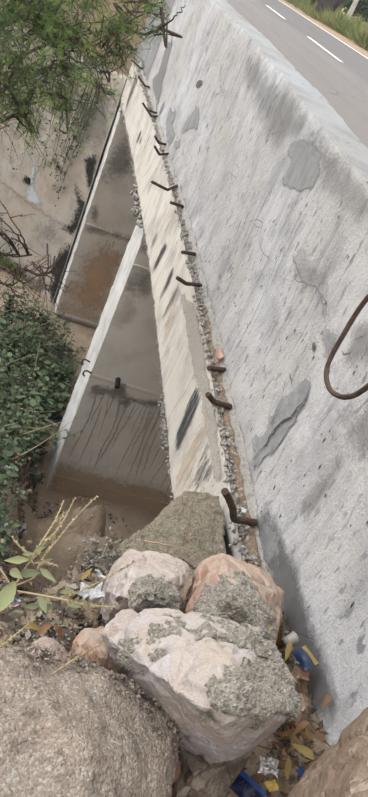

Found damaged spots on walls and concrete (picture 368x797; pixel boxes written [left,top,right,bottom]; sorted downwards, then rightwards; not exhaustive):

water stain [84,126,152,187]
peeling [282,140,321,215]
water stain [43,187,131,273]
water stain [50,245,71,302]
corrosion [176,276,202,287]
spalling [134,62,310,578]
corrosion [205,392,232,410]
water stain [69,385,199,494]
corrosion [221,488,258,526]